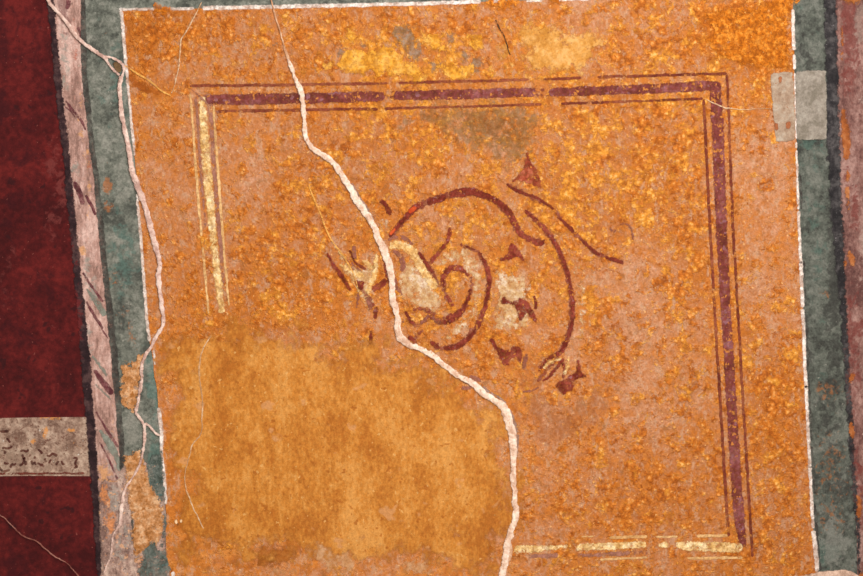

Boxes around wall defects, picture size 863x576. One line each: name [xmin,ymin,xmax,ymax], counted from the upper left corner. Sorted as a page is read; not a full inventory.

crack [0,515,79,576]
crack [46,0,202,576]
peeling [119,353,144,413]
peeling [98,450,182,576]
crack [184,336,211,528]
crack [271,0,519,576]